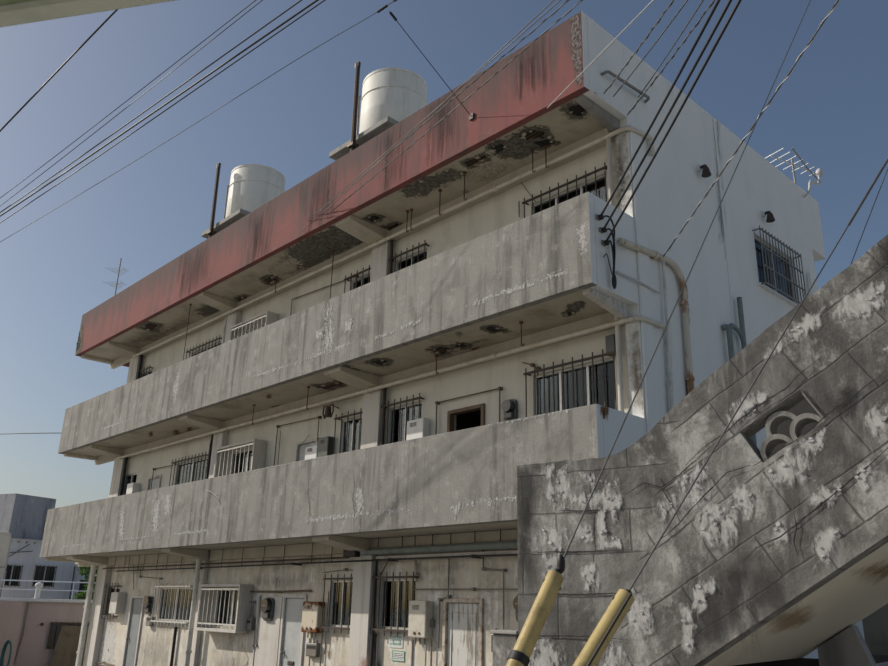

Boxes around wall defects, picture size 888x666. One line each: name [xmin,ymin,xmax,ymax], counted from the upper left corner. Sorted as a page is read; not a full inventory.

peeling [570,14,583,84]
spalling [561,101,589,120]
spalling [399,125,561,200]
peeling [284,226,362,270]
spalling [425,342,473,357]
spalling [480,324,506,334]
leakage [465,269,569,308]
peeling [562,301,585,317]
crack [539,358,888,564]
leakage [451,473,530,548]
crack [534,588,616,596]
leakage [692,559,782,635]